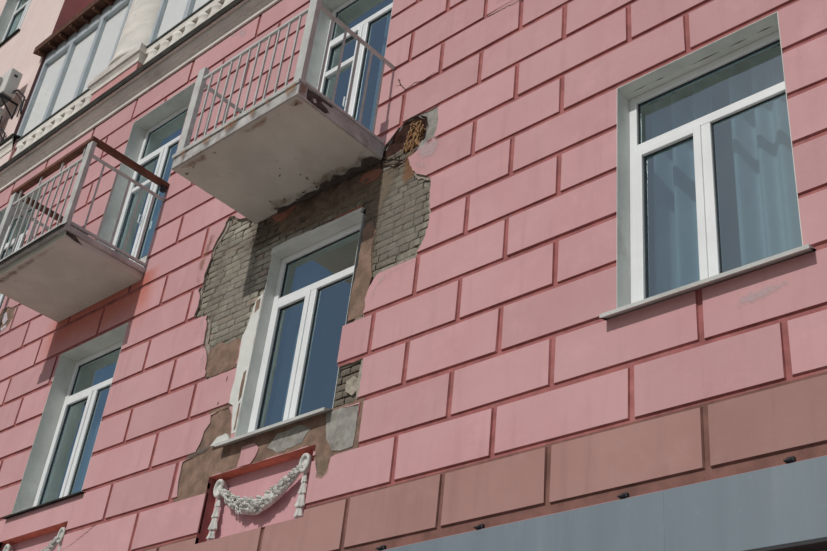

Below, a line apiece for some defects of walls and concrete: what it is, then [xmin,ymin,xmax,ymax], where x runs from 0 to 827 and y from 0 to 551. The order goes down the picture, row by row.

flaking render [173,149,431,503]